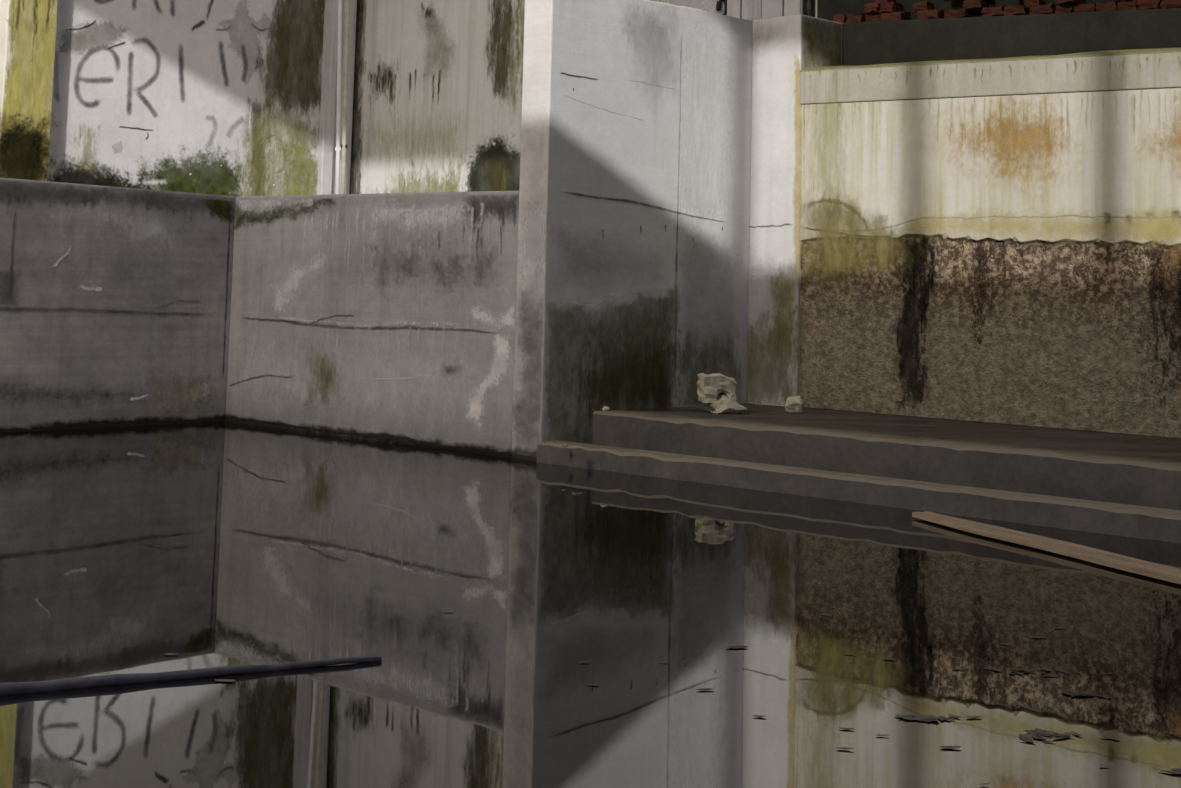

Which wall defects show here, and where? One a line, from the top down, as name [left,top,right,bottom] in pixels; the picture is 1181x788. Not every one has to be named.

crack [0,213,490,385]
leakage [237,103,953,444]
leakage [1049,211,1181,243]